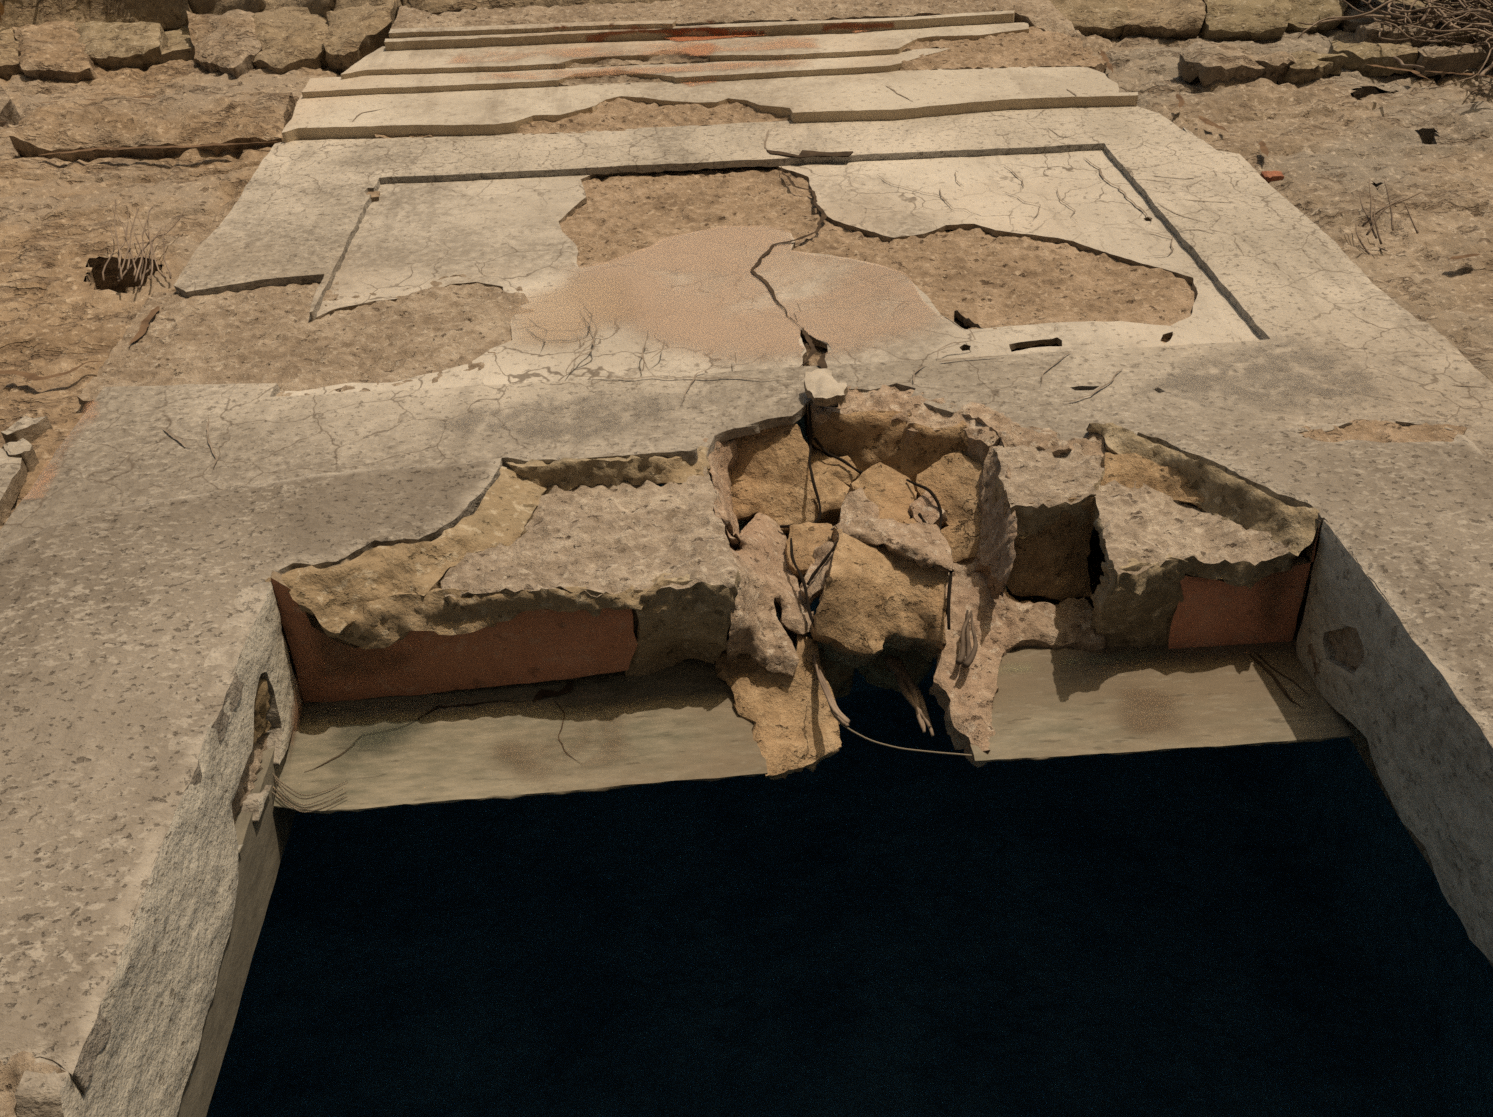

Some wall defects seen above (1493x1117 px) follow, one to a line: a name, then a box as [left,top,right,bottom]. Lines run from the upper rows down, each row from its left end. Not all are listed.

spalling [560,166,1196,342]
crack [1050,129,1232,257]
crack [528,130,1078,630]
peeling [1299,419,1467,443]
spalling [265,385,1320,780]
spalling [232,678,272,825]